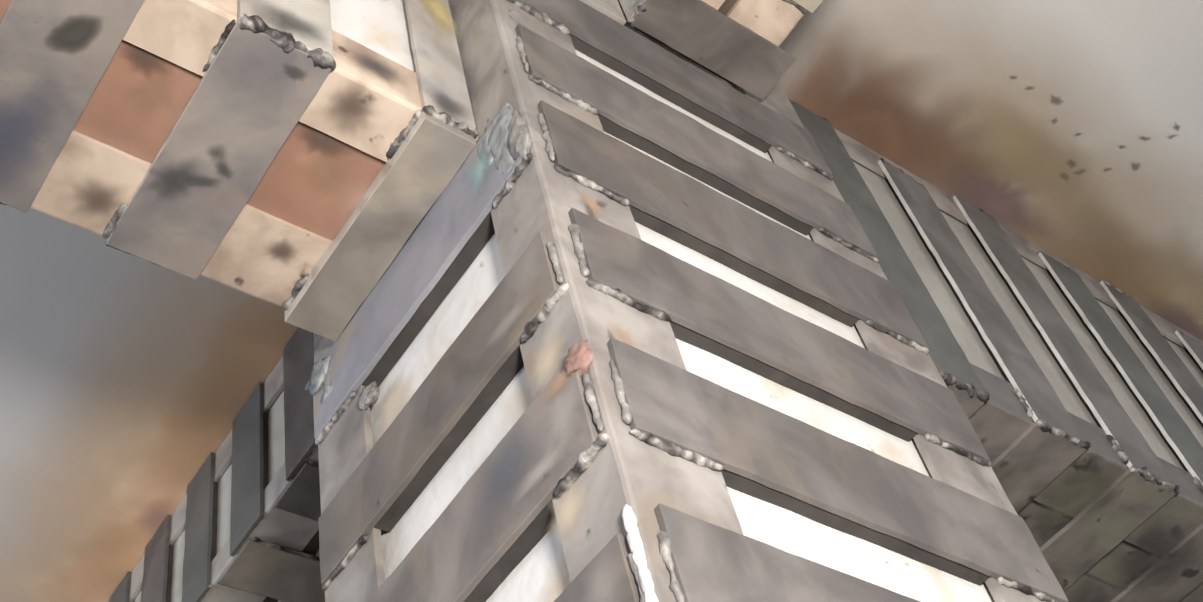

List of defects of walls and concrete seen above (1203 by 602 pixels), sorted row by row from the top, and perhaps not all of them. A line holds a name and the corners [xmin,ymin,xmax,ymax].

water stain [791,55,1203,340]
water stain [2,333,287,602]